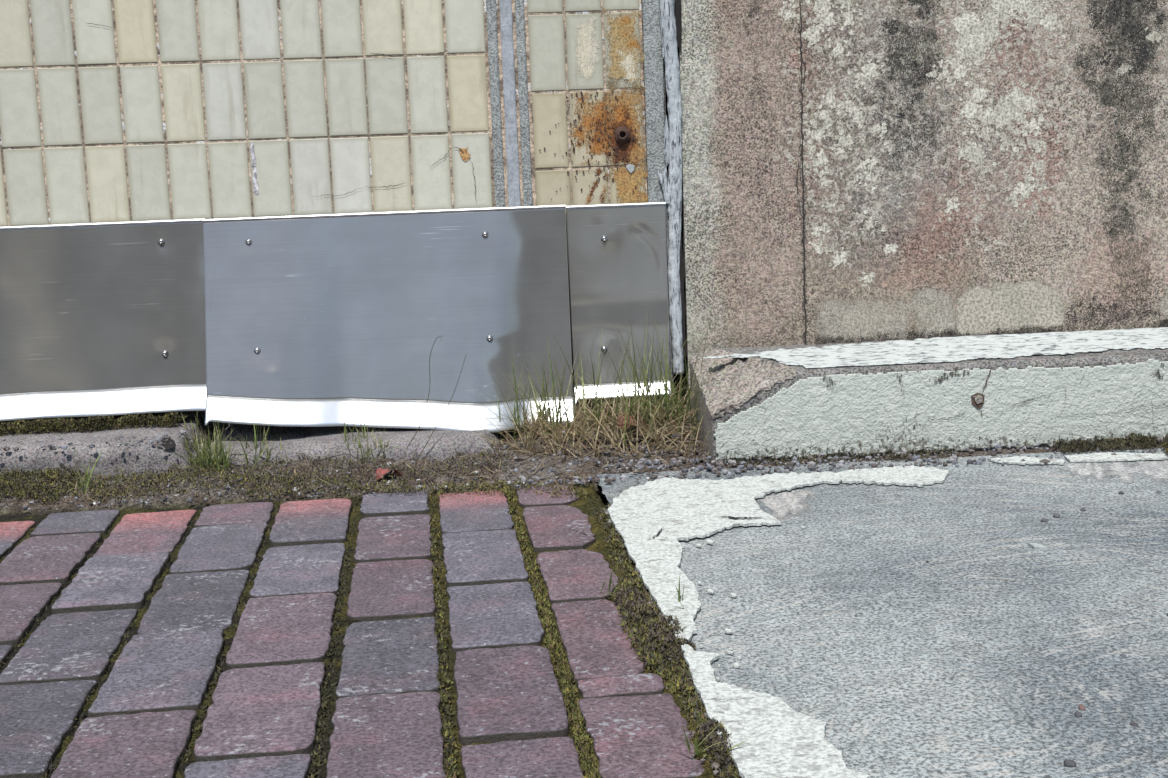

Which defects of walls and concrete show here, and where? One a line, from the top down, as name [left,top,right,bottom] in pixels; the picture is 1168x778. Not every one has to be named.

corrosion [539,8,649,204]
water stain [813,0,1168,344]
spalling [690,348,796,419]
peeling [988,452,1168,486]
peeling [602,464,950,778]